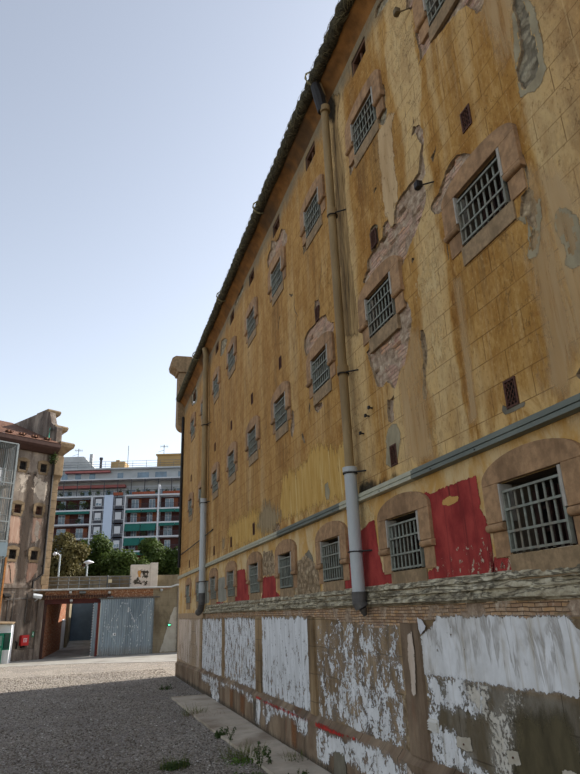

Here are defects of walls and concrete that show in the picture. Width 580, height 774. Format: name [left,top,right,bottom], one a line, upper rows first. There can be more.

spalling [511,0,546,98]
spalling [518,187,542,259]
spalling [366,303,427,423]
peeling [361,520,397,595]
peeling [424,476,520,579]
peeling [178,569,580,774]